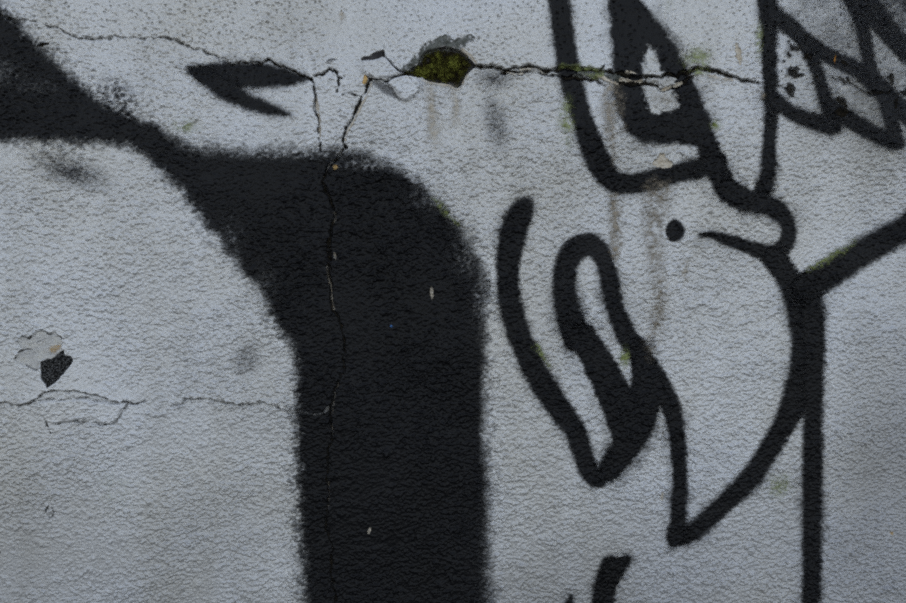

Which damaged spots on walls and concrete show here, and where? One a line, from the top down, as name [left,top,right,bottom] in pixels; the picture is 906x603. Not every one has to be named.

spalling [361,34,477,90]
crack [473,64,785,91]
crack [812,77,890,96]
crack [35,21,387,603]
spalling [14,330,73,387]